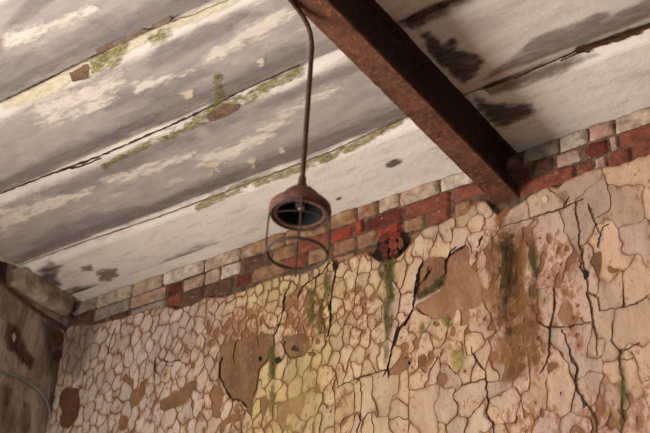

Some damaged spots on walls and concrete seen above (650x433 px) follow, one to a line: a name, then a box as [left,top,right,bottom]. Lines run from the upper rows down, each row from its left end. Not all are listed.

spalling [69,64,90,82]
damp [0,0,404,285]
damp [421,32,484,83]
damp [475,99,532,127]
flaking render [506,107,650,203]
flaking render [69,172,496,327]
peeling [59,387,81,428]
peeling [210,334,275,433]
crack [273,262,337,338]
crack [337,261,423,433]
crack [464,347,494,433]
crack [500,196,649,433]